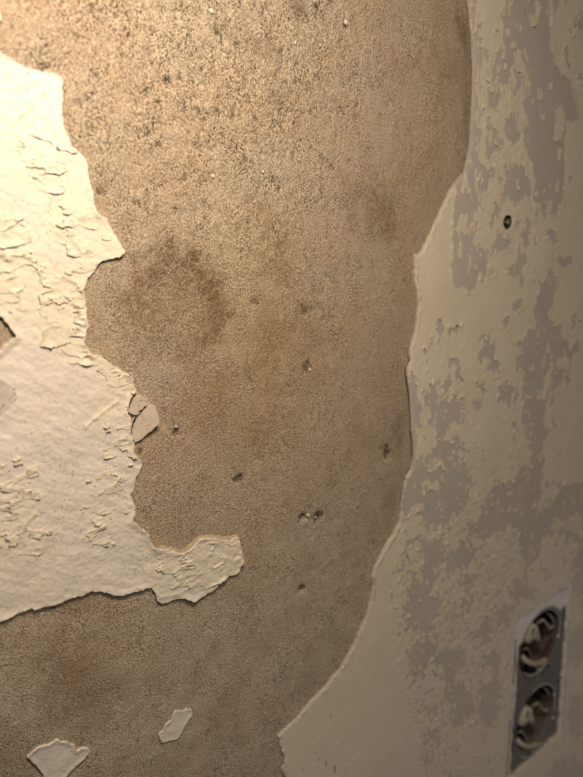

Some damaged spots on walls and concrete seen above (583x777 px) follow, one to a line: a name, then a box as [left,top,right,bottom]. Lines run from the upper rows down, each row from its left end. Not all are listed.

peeling [0,53,244,622]
peeling [277,0,583,777]
peeling [27,738,90,777]
peeling [158,708,192,743]